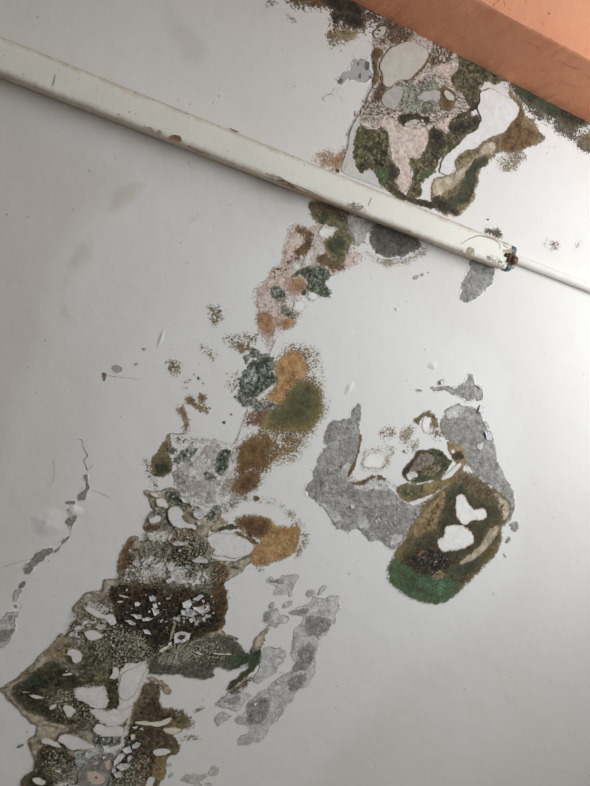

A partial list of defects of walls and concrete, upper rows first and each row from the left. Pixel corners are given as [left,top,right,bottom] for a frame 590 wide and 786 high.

mould [267,0,384,50]
flaking render [337,17,546,217]
mould [504,81,590,155]
flaking render [458,259,496,304]
leakage [254,382,278,405]
flaking render [304,403,425,551]
flaking render [415,373,519,544]
leakage [237,615,302,697]
peeling [215,573,342,746]
leakage [0,692,37,786]
leakage [73,725,130,763]